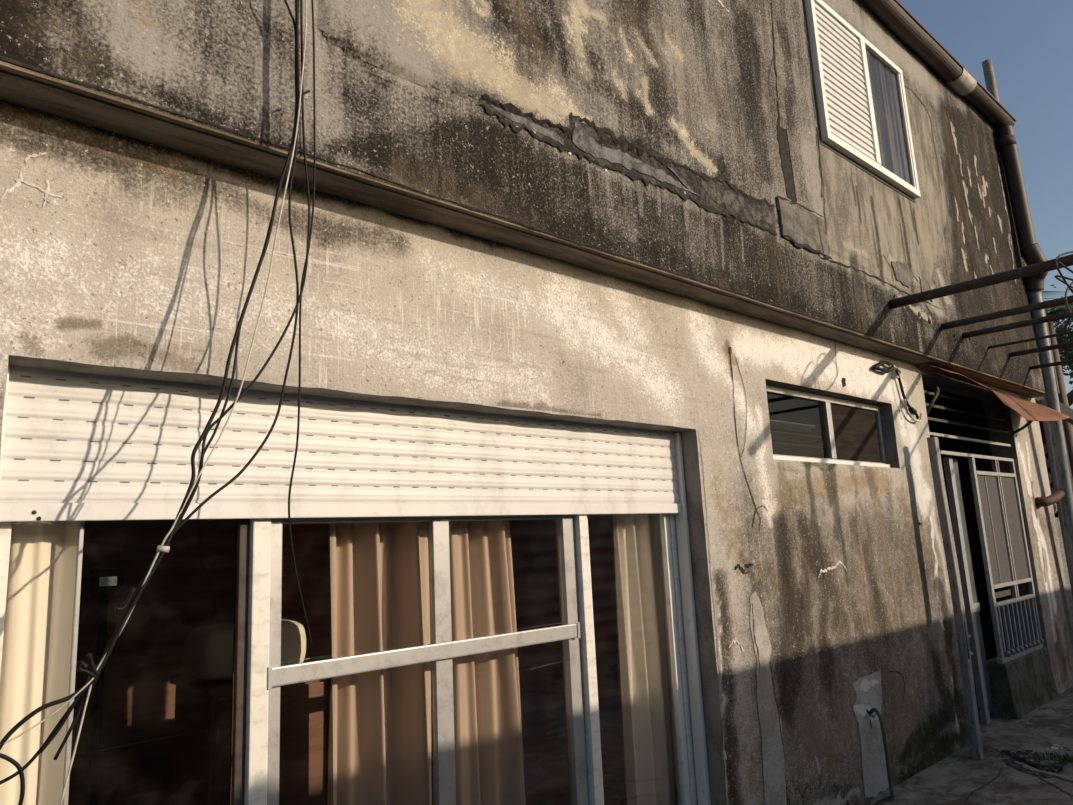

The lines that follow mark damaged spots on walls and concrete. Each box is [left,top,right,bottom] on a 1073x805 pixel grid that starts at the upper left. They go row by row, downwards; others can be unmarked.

peeling [642,76,650,115]
crack [768,3,780,126]
water stain [397,160,544,227]
crack [0,23,1044,391]
spalling [477,85,777,236]
water stain [853,187,885,285]
water stain [898,199,919,292]
water stain [941,109,1016,340]
water stain [952,317,1007,366]
water stain [829,465,849,585]
water stain [773,462,825,718]
water stain [934,577,957,704]